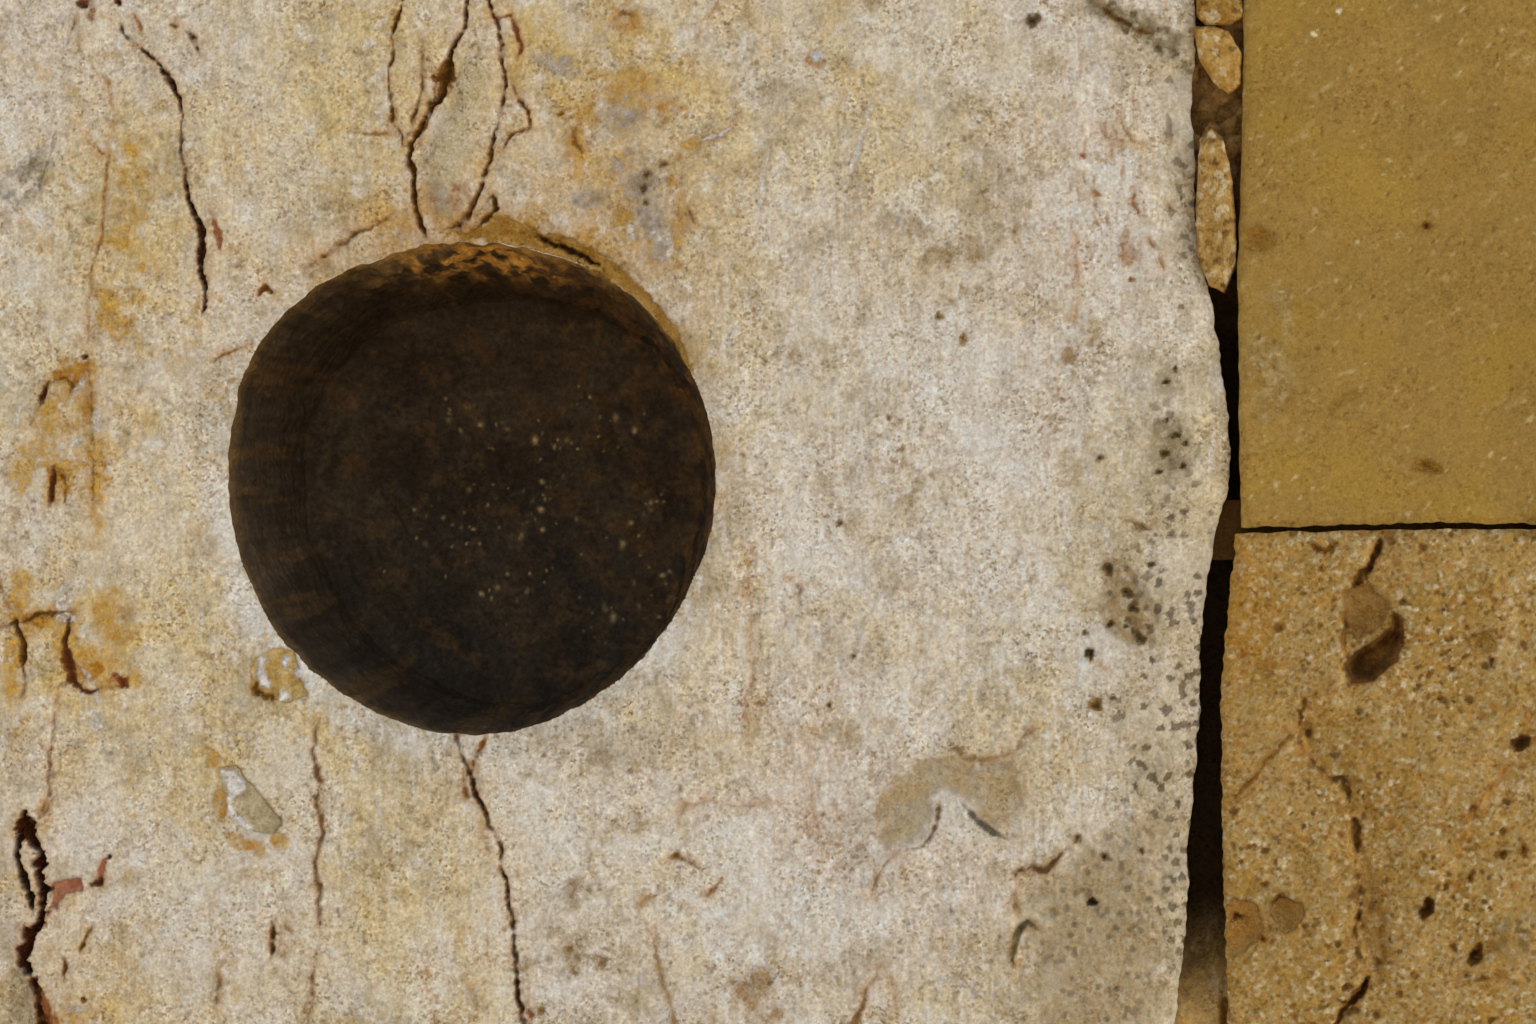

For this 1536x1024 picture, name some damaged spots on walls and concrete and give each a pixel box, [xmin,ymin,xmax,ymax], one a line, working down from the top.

crack [121,17,222,312]
crack [258,284,273,296]
crack [322,0,532,258]
crack [0,586,129,1024]
spalling [207,749,288,855]
crack [431,735,534,1024]
crack [1234,734,1382,1024]